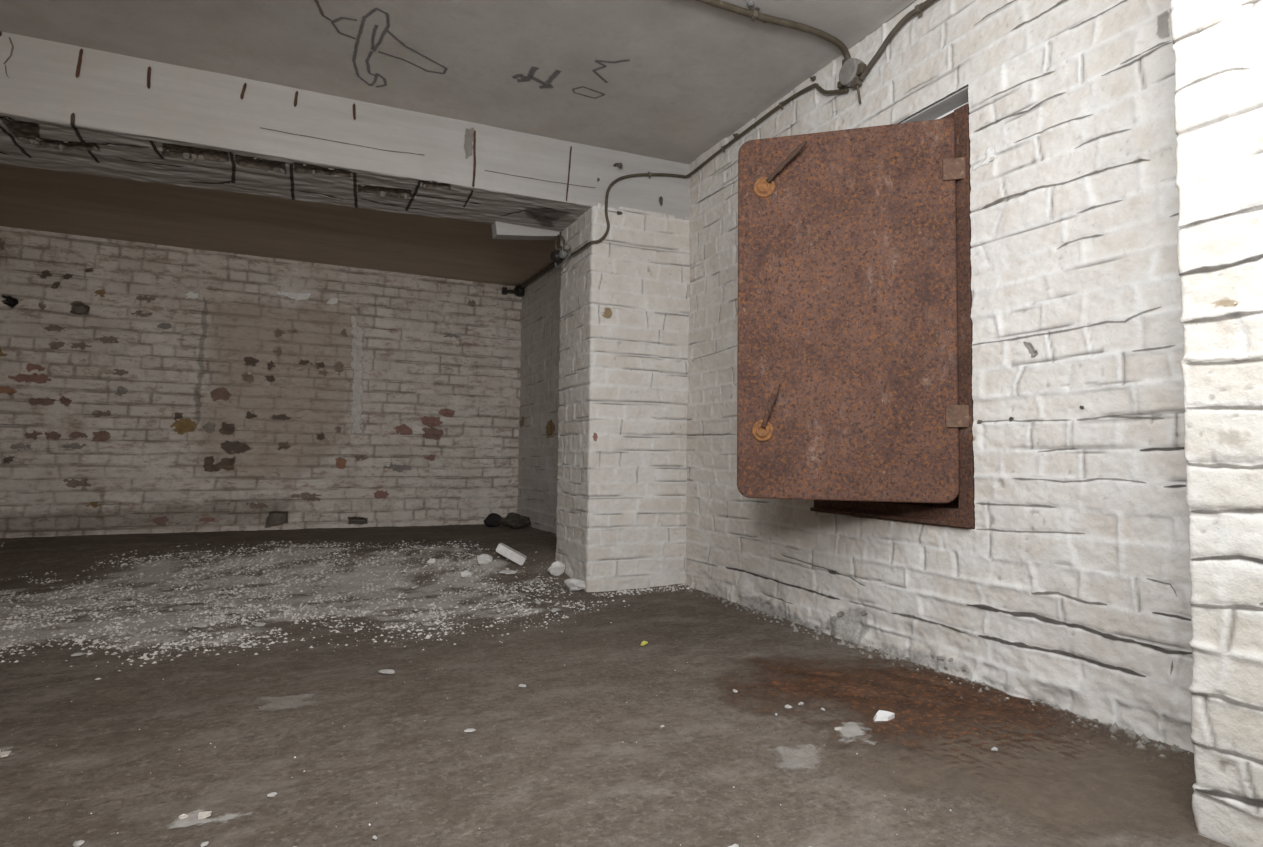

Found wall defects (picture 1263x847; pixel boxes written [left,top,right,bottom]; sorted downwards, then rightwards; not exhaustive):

crack [315,0,332,21]
crack [75,48,83,78]
crack [145,66,153,89]
crack [239,83,247,99]
crack [0,91,595,217]
spalling [2,295,18,308]
spalling [70,289,106,315]
peeling [0,363,72,406]
peeling [3,410,111,464]
peeling [171,411,257,472]
peeling [395,408,455,440]
corrosion [730,659,1090,753]